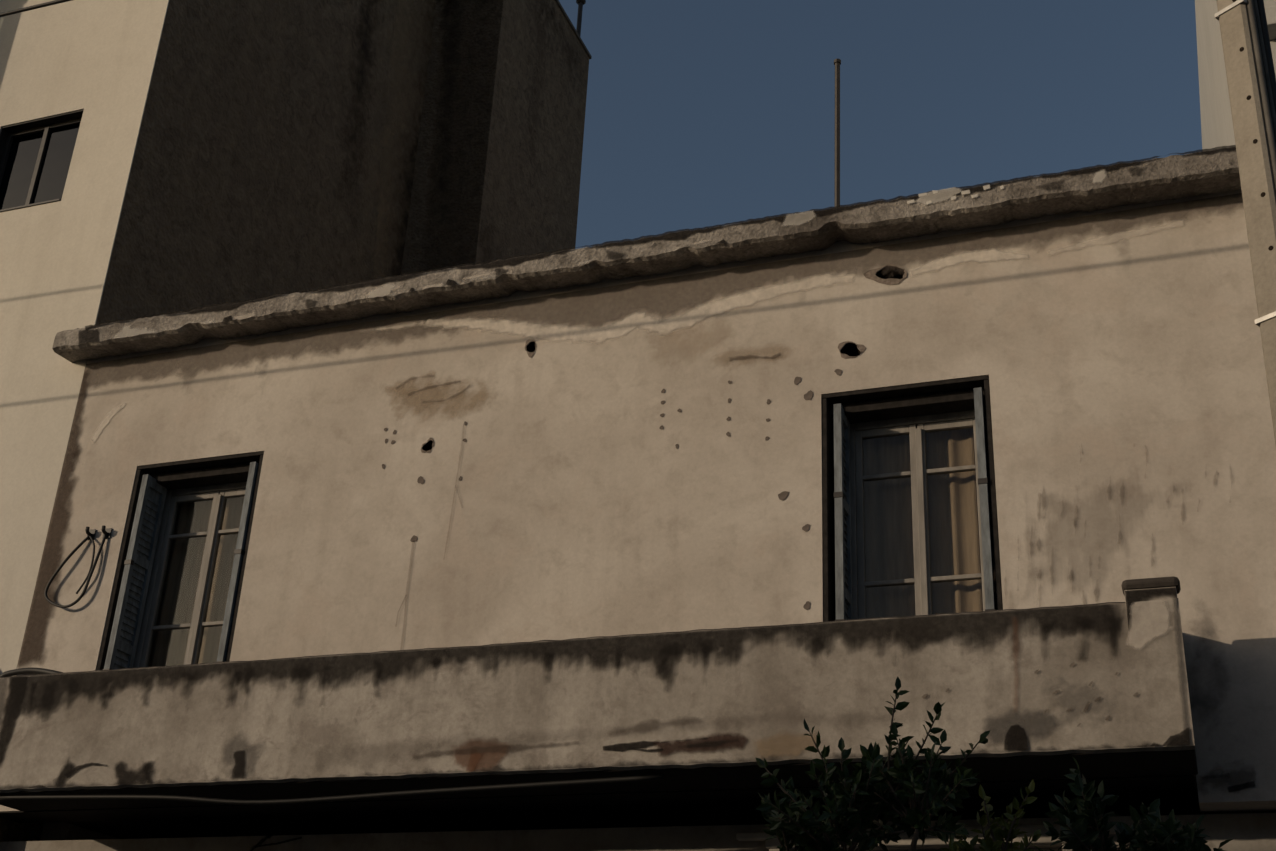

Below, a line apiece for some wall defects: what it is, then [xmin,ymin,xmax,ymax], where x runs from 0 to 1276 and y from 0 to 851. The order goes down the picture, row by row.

peeling [907,185,1004,204]
damp [161,145,1236,315]
peeling [369,285,392,298]
peeling [377,249,1028,358]
spalling [834,341,866,375]
damp [0,193,1243,763]
peeling [1129,600,1168,648]
damp [0,762,174,789]
damp [213,751,245,781]